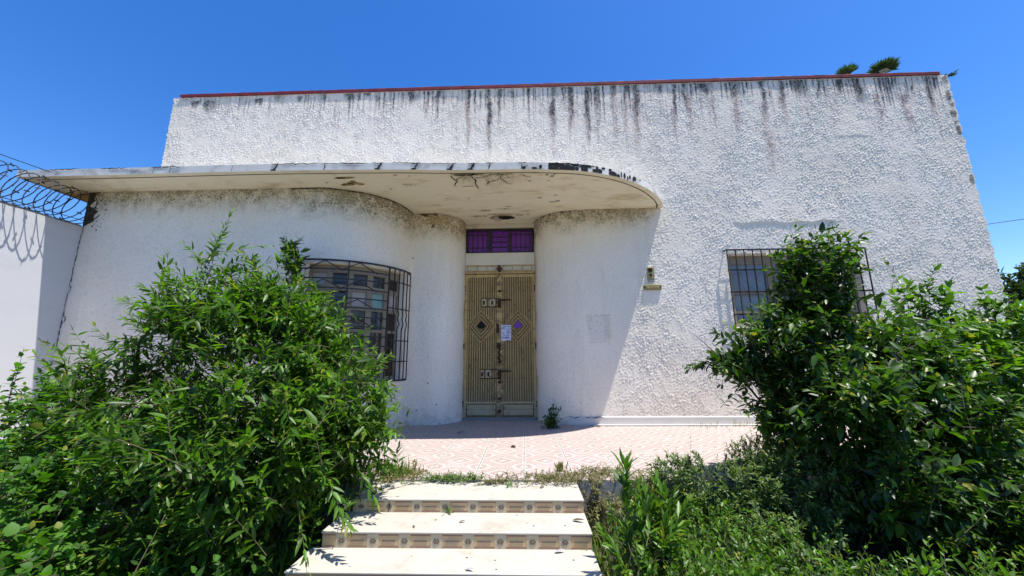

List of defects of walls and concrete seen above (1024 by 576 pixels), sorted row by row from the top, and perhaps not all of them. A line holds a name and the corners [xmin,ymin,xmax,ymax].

leakage [462,85,640,126]
leakage [657,83,708,115]
leakage [720,78,862,101]
crack [447,162,531,189]
peeling [522,162,641,181]
leakage [82,189,278,231]
leakage [291,188,645,234]